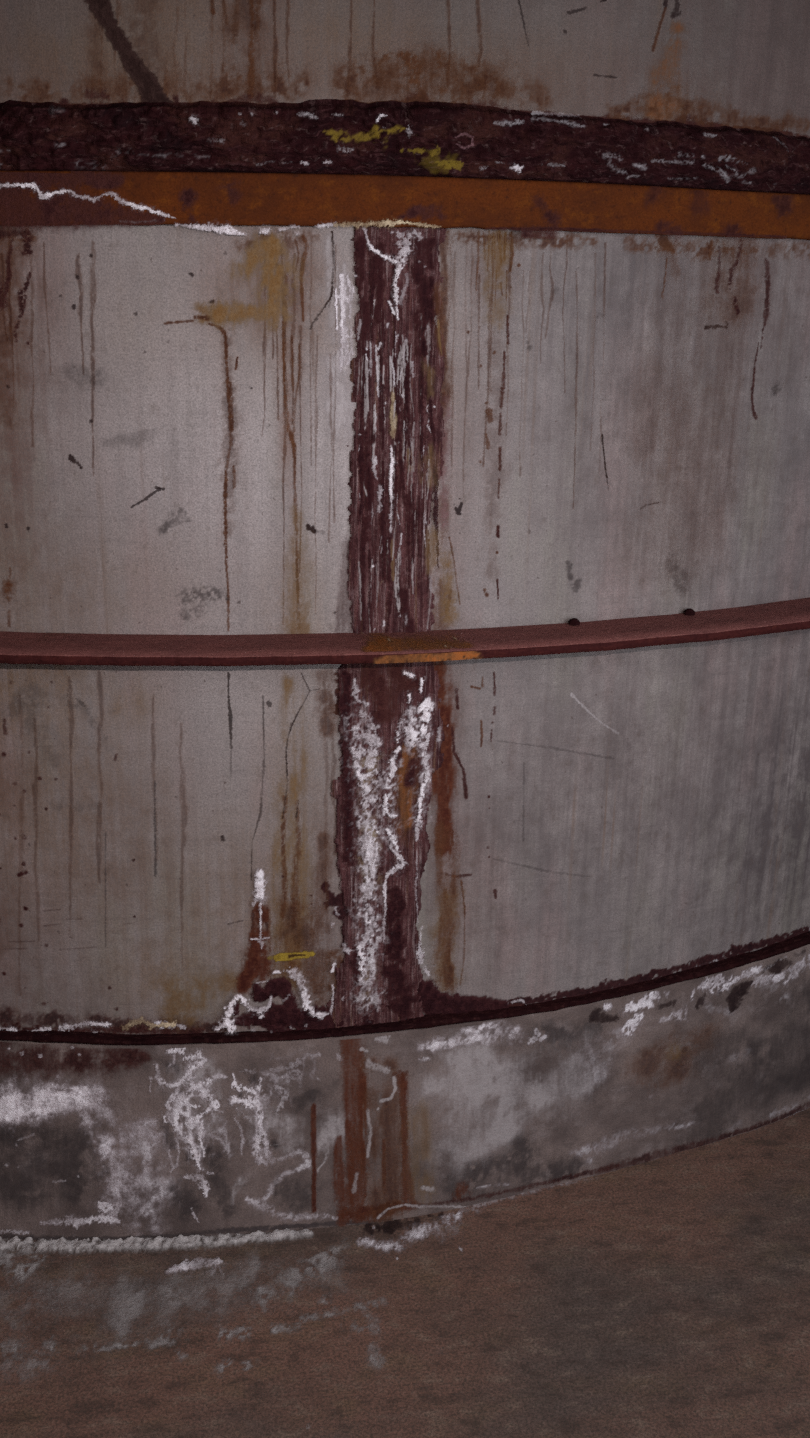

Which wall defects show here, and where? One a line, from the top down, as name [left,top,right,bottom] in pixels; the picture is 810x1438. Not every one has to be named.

corrosion [336,52,808,138]
corrosion [652,0,681,52]
corrosion [0,171,165,345]
corrosion [0,195,810,1227]
water stain [0,671,810,1281]
water stain [286,1249,338,1294]